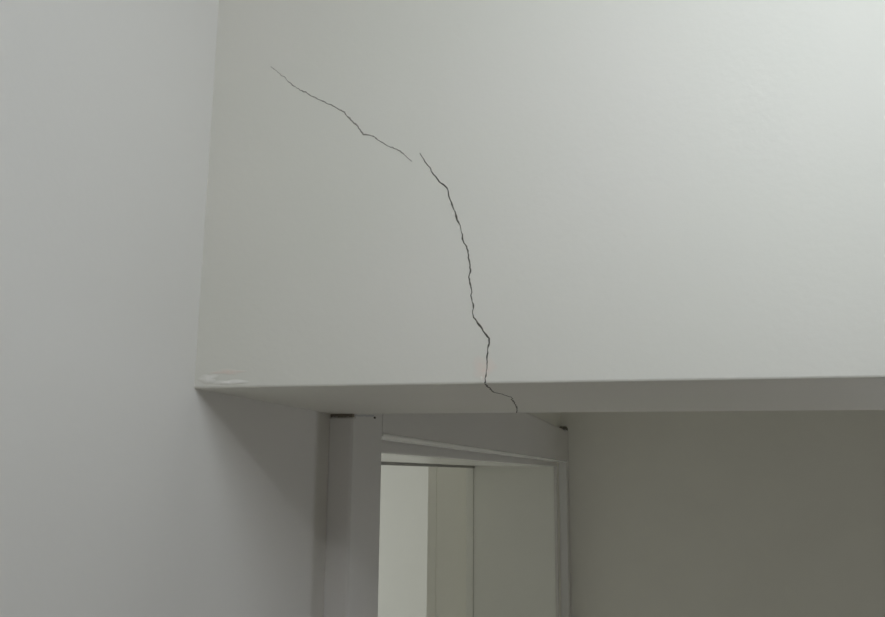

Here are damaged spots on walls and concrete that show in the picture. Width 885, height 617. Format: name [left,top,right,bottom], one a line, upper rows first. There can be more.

crack [273,68,518,413]